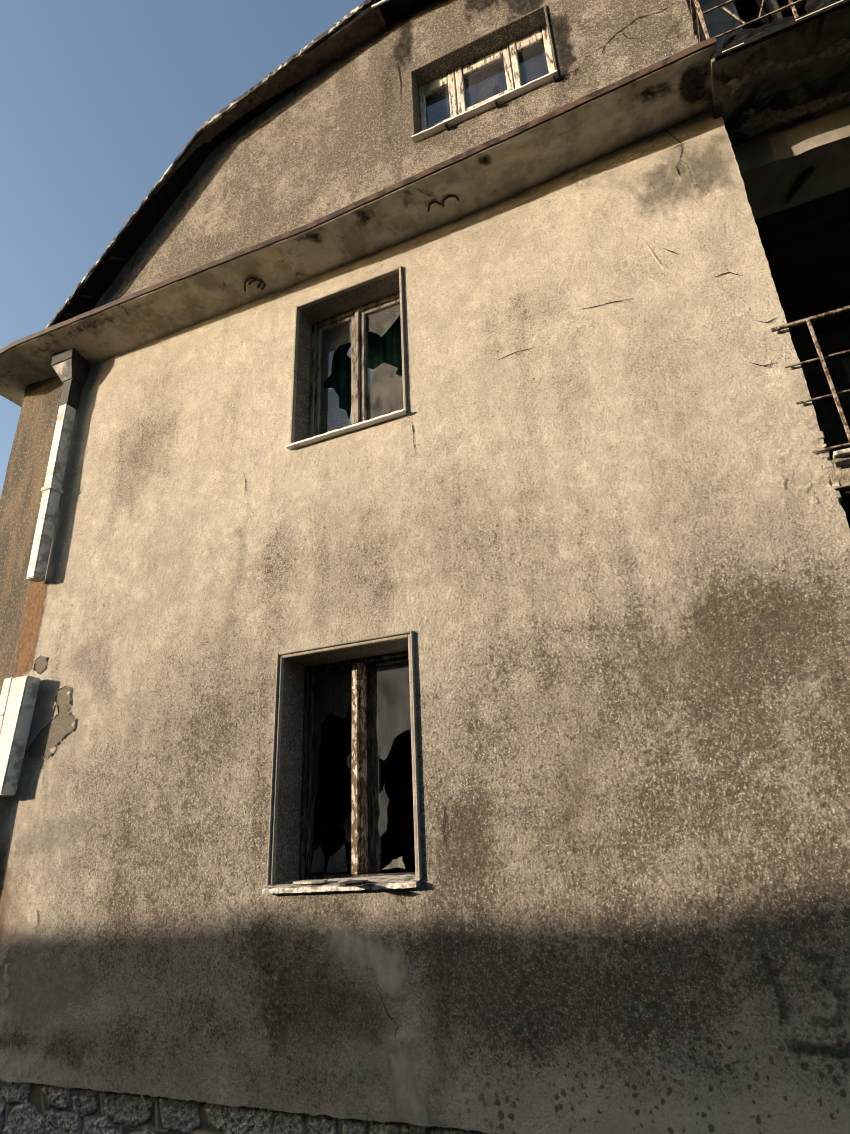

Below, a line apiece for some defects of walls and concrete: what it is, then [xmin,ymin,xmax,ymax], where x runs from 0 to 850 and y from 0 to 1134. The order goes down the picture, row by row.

leakage [639,66,712,106]
flaking render [26,685,78,814]